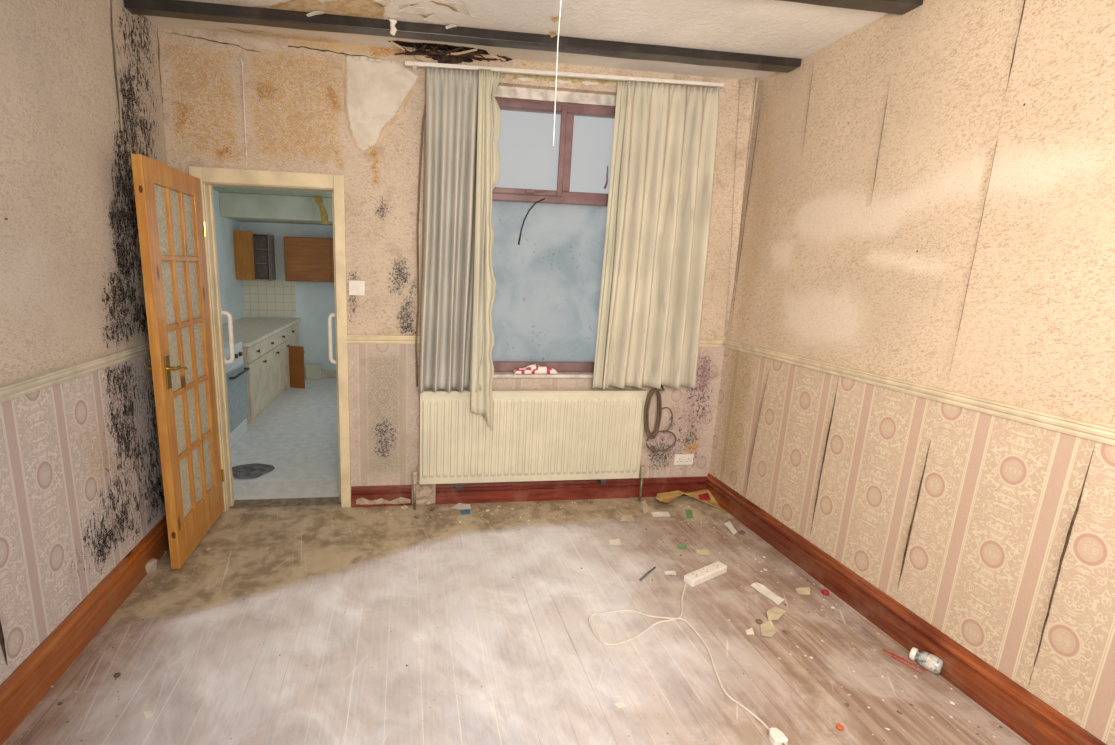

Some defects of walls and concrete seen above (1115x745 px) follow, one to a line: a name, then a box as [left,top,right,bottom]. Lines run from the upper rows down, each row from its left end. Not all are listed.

crack [0,595,14,665]
damp [69,8,415,578]
peeling [253,0,397,36]
peeling [342,55,424,153]
damp [355,257,434,500]
crack [806,376,839,535]
damp [645,93,1115,489]
crack [890,436,931,596]
crack [940,0,1025,385]
crack [1019,441,1095,685]